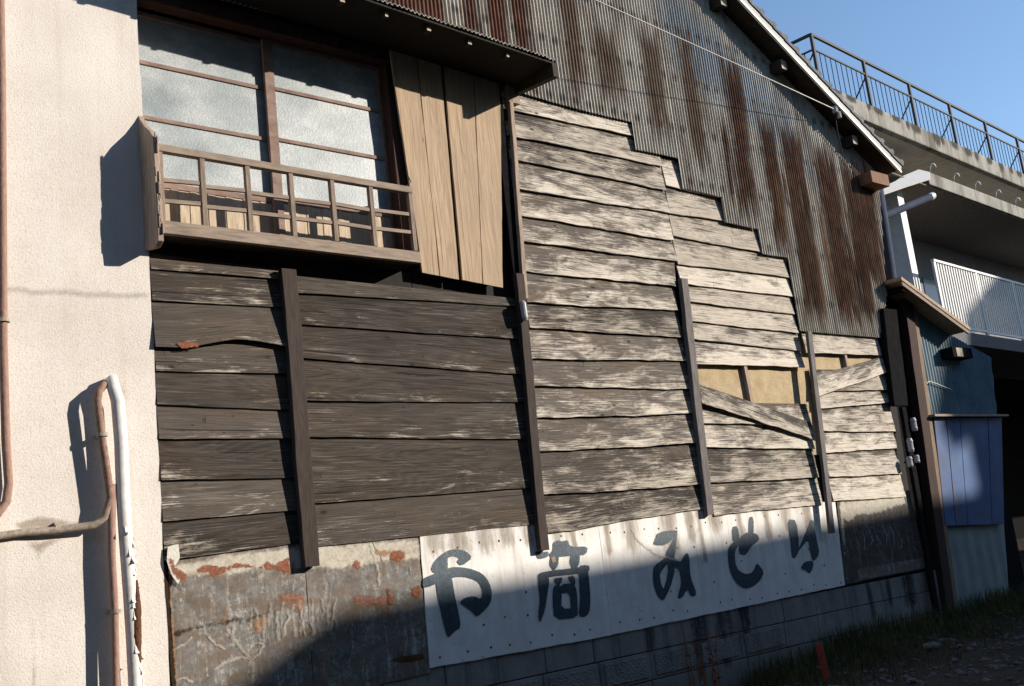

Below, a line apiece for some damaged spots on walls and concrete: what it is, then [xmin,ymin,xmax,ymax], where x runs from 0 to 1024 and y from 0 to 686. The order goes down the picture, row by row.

rust [559,0,625,97]
rust [640,33,669,130]
rust [679,31,705,166]
rust [720,57,885,327]
rust [178,340,199,348]
rust [180,558,291,579]
rust [376,550,405,562]